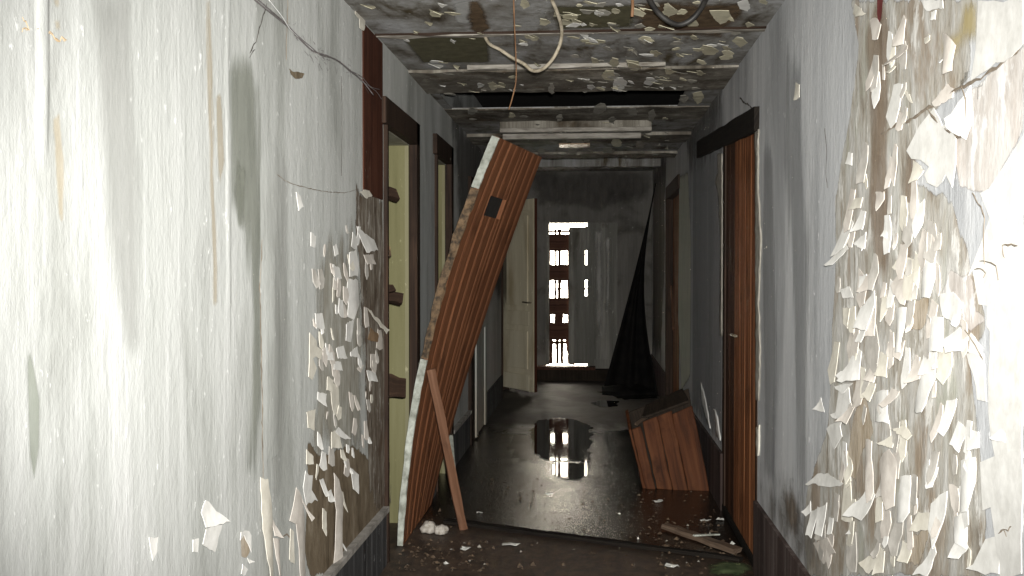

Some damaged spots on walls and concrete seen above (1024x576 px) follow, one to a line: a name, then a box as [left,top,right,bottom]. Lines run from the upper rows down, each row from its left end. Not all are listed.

peeling [355,4,376,31]
peeling [403,3,461,42]
peeling [428,60,521,96]
peeling [507,0,768,124]
peeling [538,107,669,157]
flaking render [786,0,1024,576]
flaking render [240,185,391,576]
peeling [149,537,158,560]
peeling [192,500,231,552]